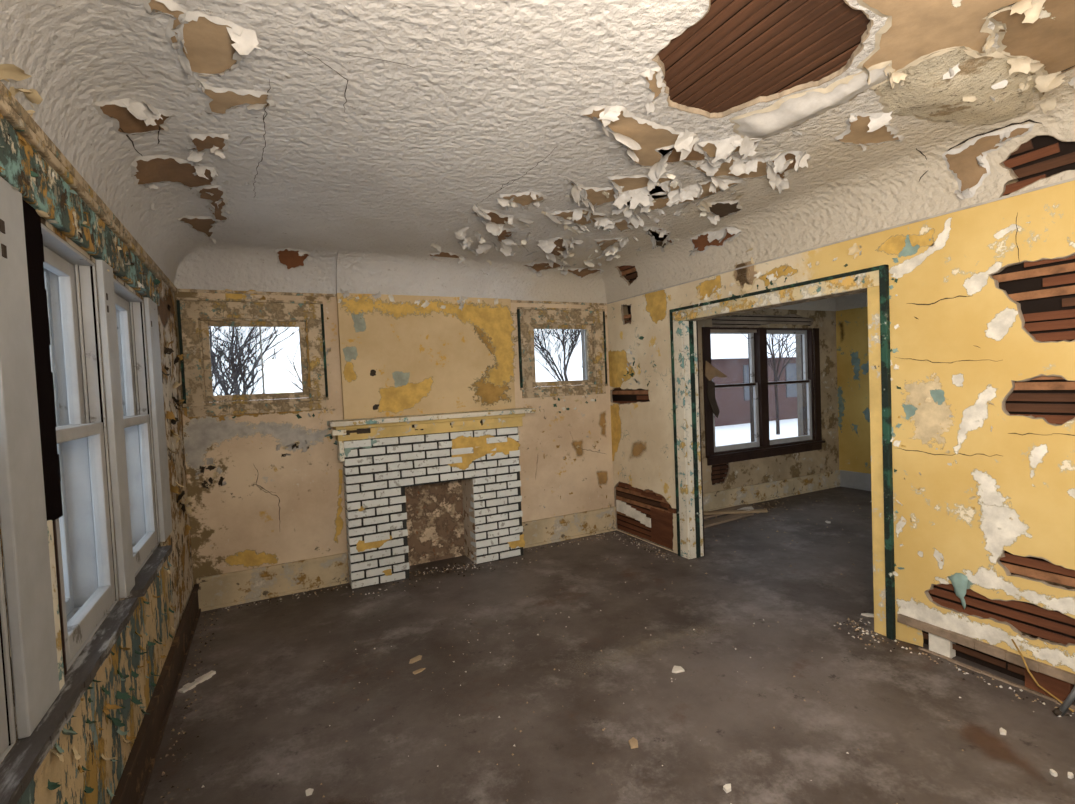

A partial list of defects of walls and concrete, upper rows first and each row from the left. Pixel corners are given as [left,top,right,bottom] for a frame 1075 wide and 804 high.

peeling [91,98,175,135]
peeling [130,133,251,244]
peeling [143,0,276,115]
crack [253,79,271,197]
spalling [427,0,1075,286]
peeling [875,217,952,299]
spalling [963,237,1075,343]
peeling [326,289,520,470]
spalling [890,348,1075,466]
spalling [599,481,676,551]
peeling [895,468,1075,711]
peeling [50,626,175,797]